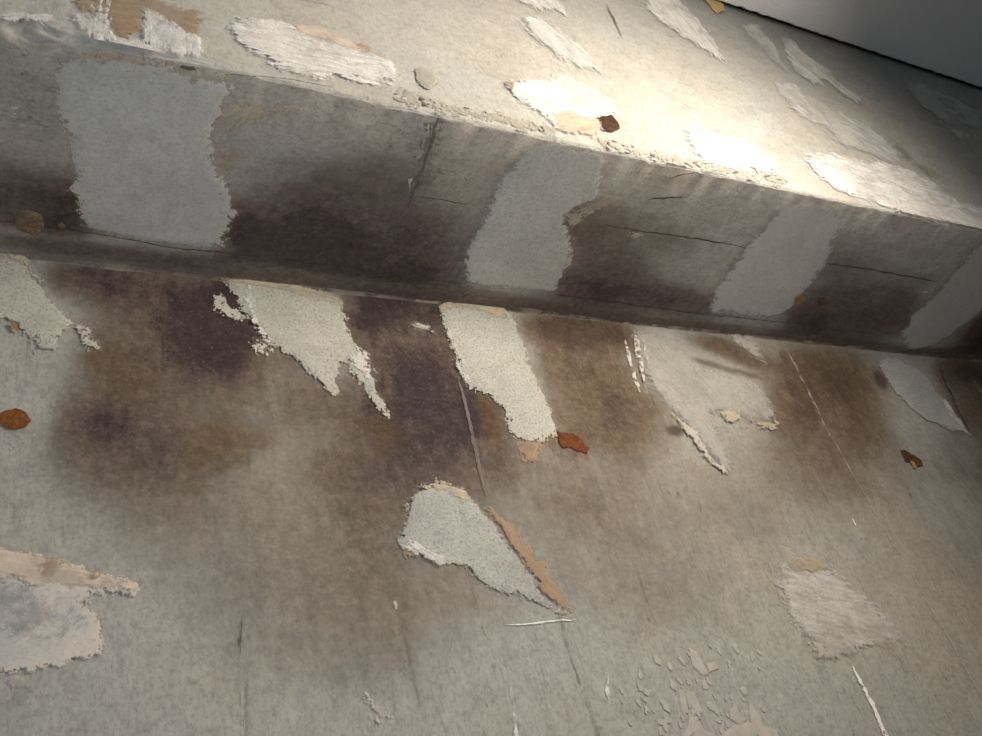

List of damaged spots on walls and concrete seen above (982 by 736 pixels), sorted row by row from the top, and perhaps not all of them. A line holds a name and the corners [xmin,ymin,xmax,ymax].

crack [229,74,329,87]
corrosion [597,115,620,132]
crack [45,116,467,285]
water stain [0,162,982,646]
corrosion [0,408,31,429]
corrosion [556,431,589,454]